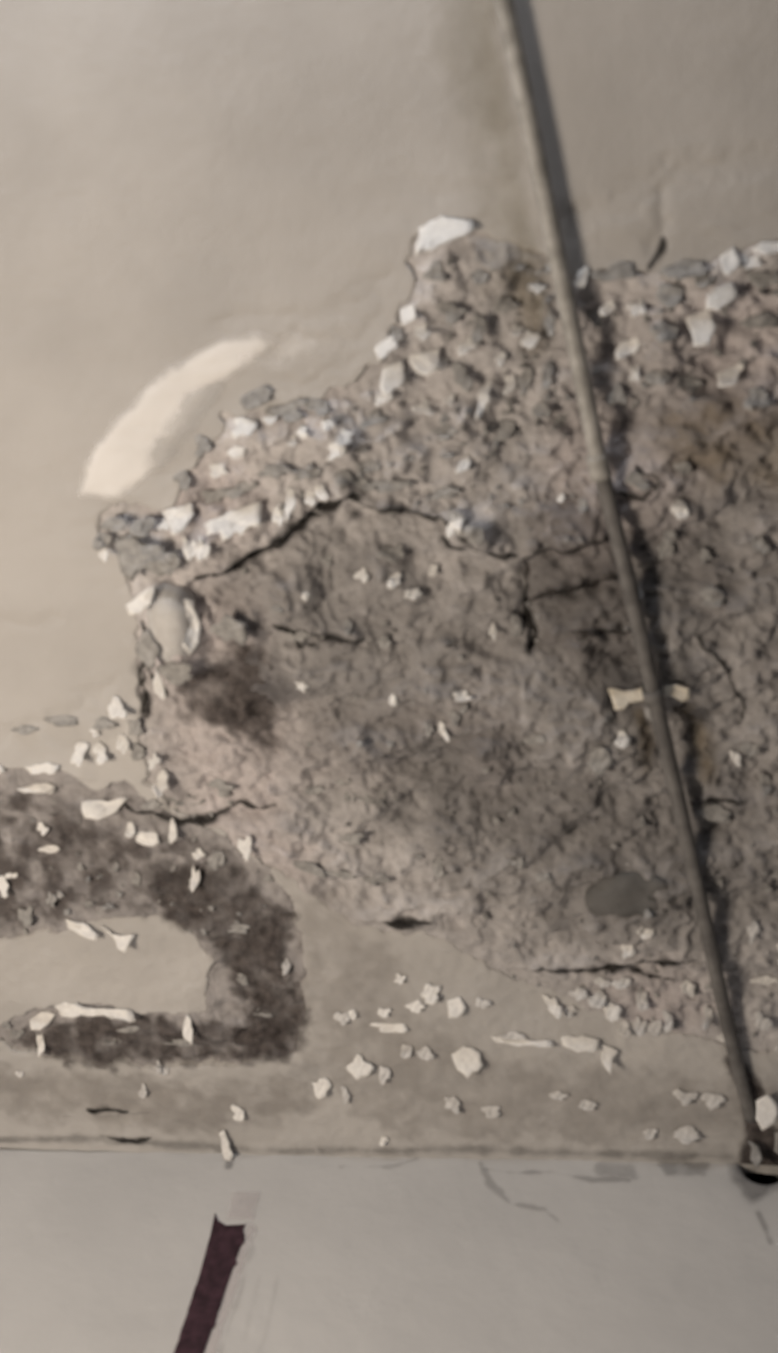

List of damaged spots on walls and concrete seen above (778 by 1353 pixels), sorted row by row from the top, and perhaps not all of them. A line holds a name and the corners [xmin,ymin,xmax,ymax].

spalling [0,216,778,1199]
crack [195,493,618,653]
crack [572,629,631,638]